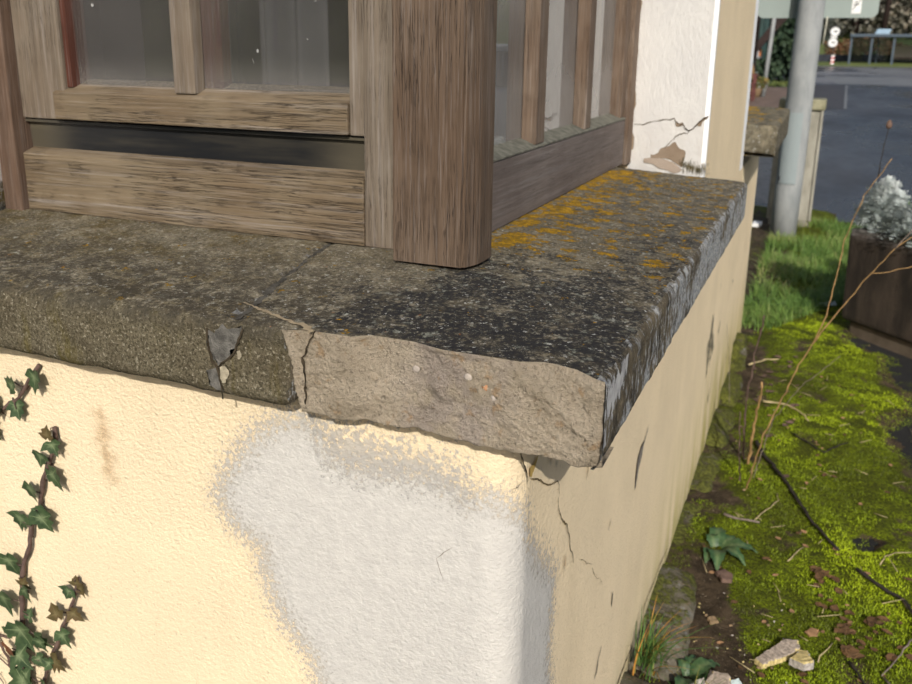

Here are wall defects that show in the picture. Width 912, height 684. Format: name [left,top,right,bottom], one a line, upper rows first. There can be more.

peeling [643,142,686,173]
crack [641,116,709,149]
crack [206,328,243,399]
spalling [220,366,229,383]
crack [244,302,316,404]
crack [516,453,603,585]